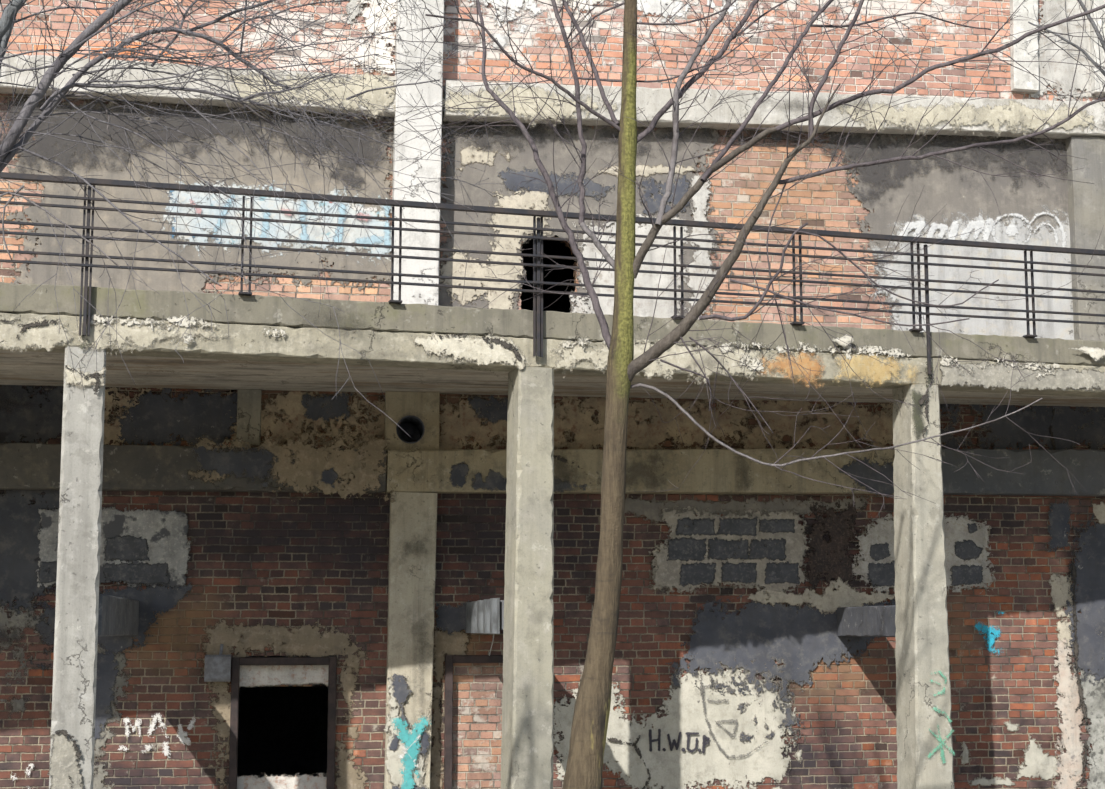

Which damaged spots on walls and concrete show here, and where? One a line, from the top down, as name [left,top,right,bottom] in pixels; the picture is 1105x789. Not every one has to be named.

peeling [491,33,509,48]
flaking render [0,316,227,352]
spalling [409,332,527,370]
flaking render [551,336,609,371]
flaking render [634,338,761,383]
spalling [833,334,854,347]
peeling [115,388,237,446]
peeling [301,392,353,422]
peeling [321,468,338,488]
peeling [449,462,507,491]
spalling [46,733,84,789]
peeling [335,726,369,789]